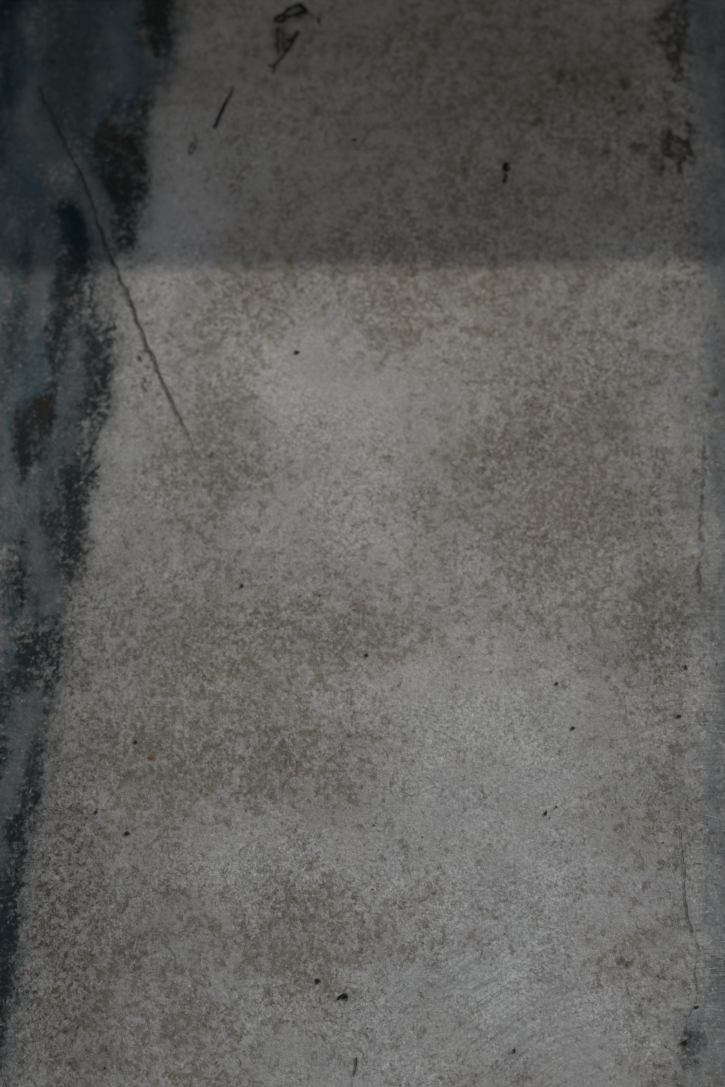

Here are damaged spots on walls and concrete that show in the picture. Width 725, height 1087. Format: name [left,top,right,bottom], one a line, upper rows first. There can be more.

crack [39,87,195,456]
damp [643,0,725,437]
damp [0,0,186,1068]
crack [679,827,725,1054]